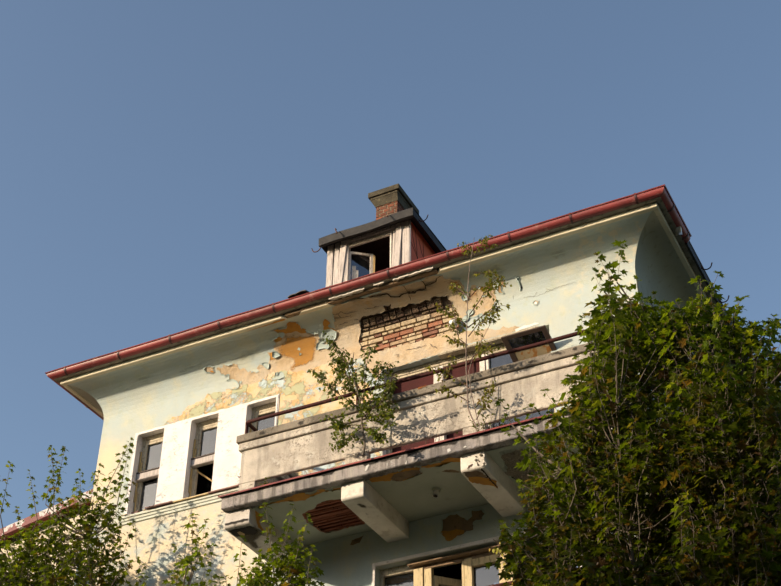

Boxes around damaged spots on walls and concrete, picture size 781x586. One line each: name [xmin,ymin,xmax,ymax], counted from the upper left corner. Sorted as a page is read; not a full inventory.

crack [333,275,443,325]
flaking render [164,274,539,425]
peeling [296,460,345,476]
peeling [356,443,498,488]
spalling [499,438,553,488]
spalling [255,480,365,533]
peeling [440,509,486,541]